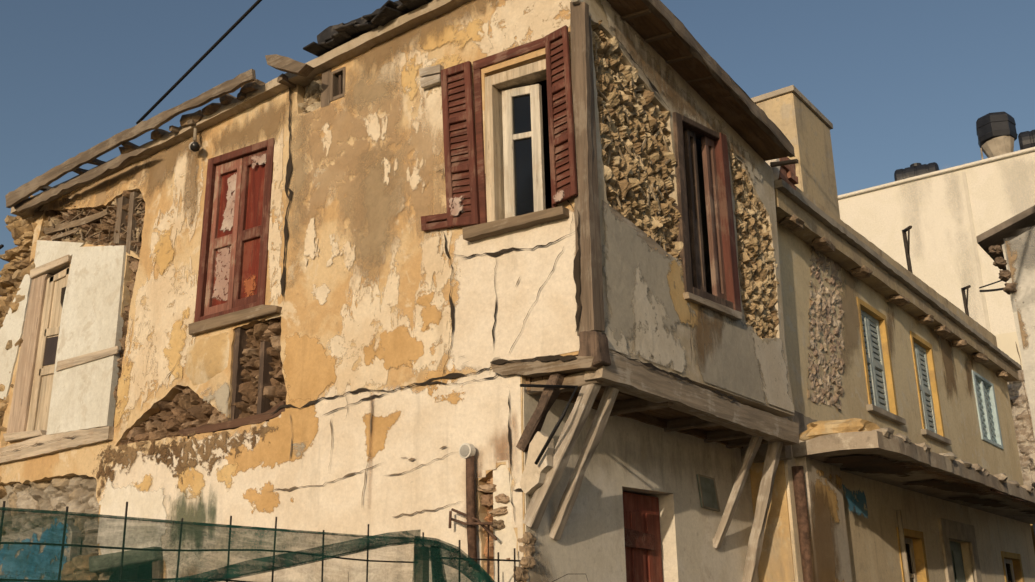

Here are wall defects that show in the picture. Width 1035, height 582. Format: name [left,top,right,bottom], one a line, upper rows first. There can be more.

crack [278,88,292,305]
flaking render [298,75,323,114]
peeling [361,112,387,141]
peeling [370,0,571,213]
flaking render [591,0,805,413]
peeling [39,123,580,582]
crack [270,200,575,525]
flaking render [807,236,873,410]